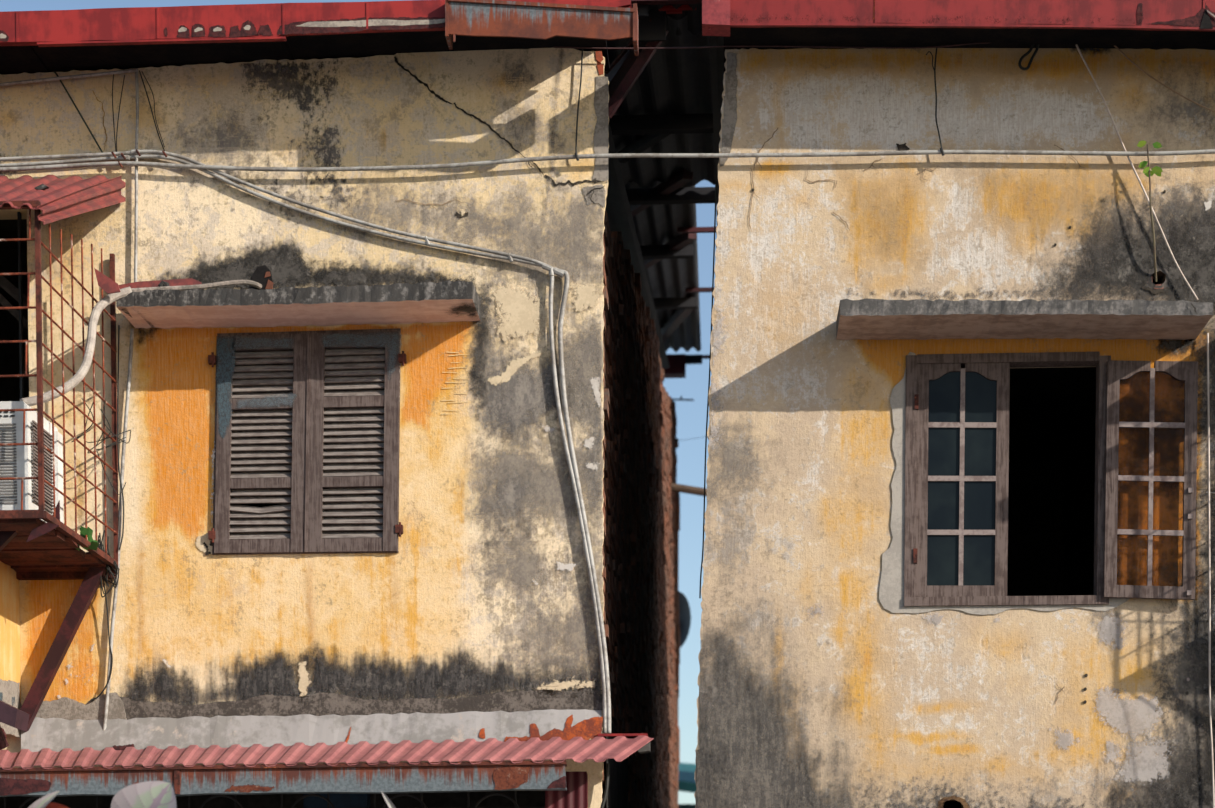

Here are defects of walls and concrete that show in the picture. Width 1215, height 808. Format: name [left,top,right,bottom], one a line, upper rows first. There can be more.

rust [164,17,445,39]
crack [394,56,607,203]
crack [395,199,466,209]
leakage [160,60,603,592]
peeling [488,282,554,386]
leakage [893,183,1215,808]
leakage [127,589,601,705]
peeling [1097,612,1125,649]
rust [0,778,51,796]
rust [493,765,530,790]
leakage [696,623,1013,808]
peeling [1094,686,1172,785]